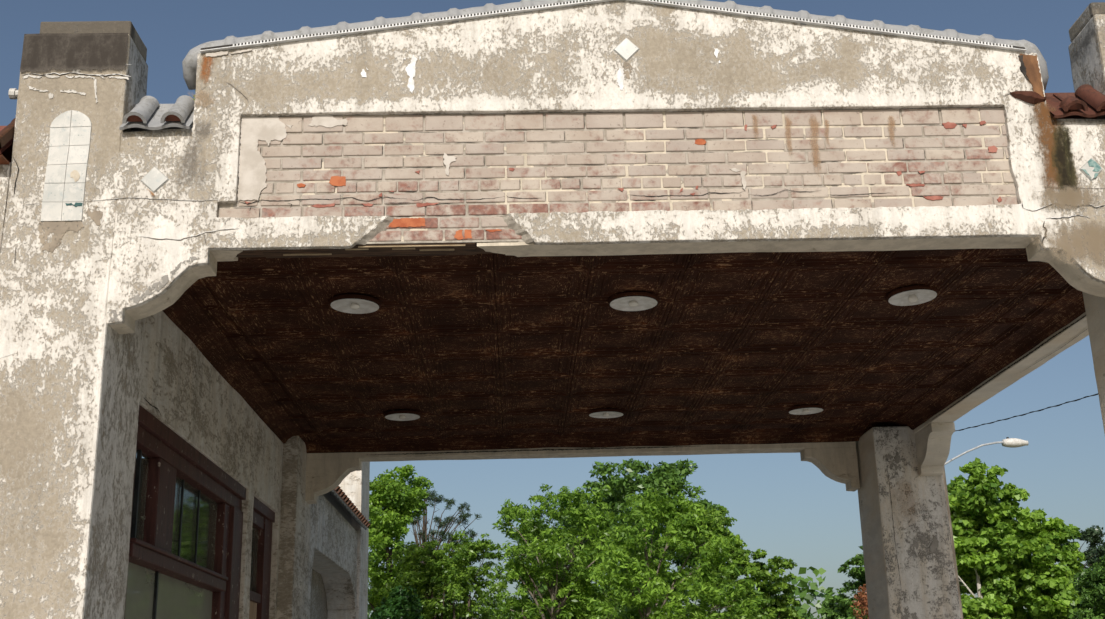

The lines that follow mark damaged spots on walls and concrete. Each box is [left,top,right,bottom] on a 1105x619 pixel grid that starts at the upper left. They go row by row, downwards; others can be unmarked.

peeling [404,55,421,94]
peeling [616,62,633,93]
corrosion [811,118,829,166]
spalling [942,121,986,129]
spalling [329,176,346,186]
spalling [896,171,944,201]
water stain [1042,126,1096,210]
flaking render [354,202,533,245]
crack [1022,186,1105,243]
water stain [1033,221,1105,264]